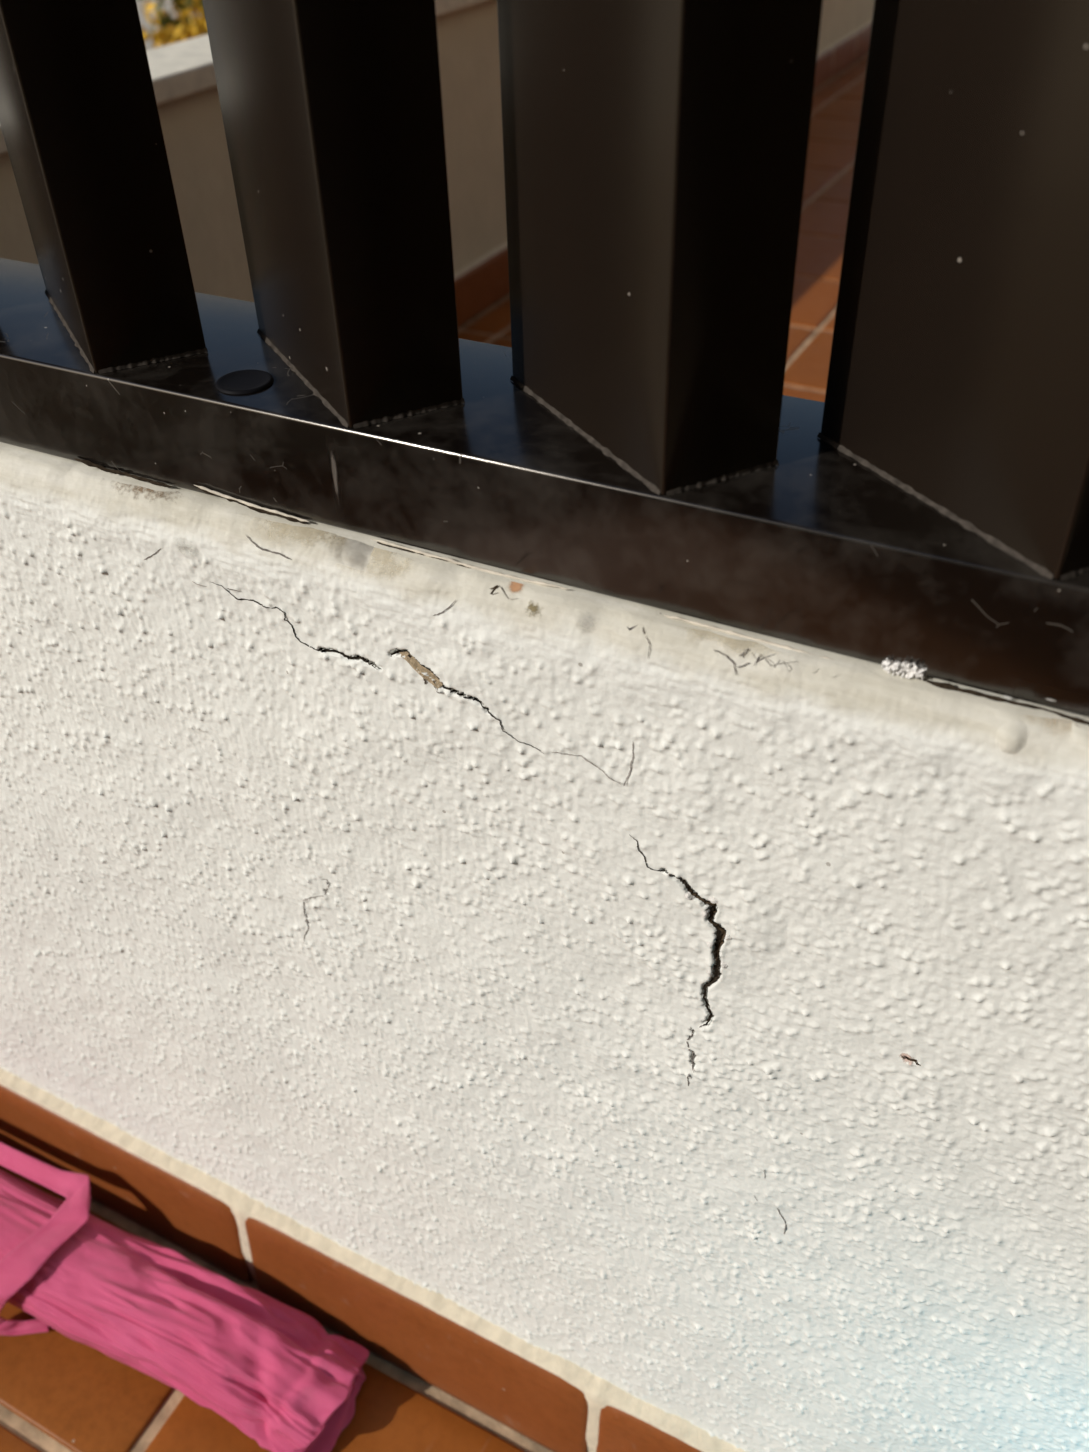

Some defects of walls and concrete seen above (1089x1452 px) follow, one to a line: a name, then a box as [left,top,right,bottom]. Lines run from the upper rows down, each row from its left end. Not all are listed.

crack [192,581,634,785]
crack [631,836,732,1086]